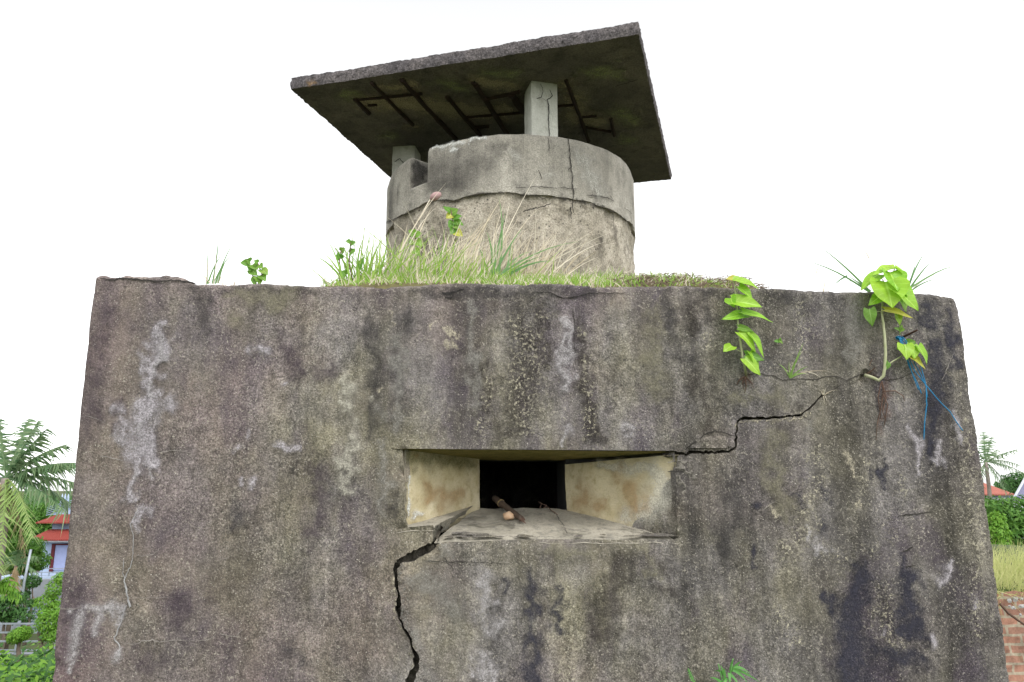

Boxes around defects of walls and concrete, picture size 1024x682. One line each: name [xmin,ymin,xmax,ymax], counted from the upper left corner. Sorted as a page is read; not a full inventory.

crack [516,87,632,228]
damp [110,320,175,527]
damp [443,284,607,442]
crack [663,372,915,458]
damp [68,603,123,673]
crack [392,526,501,682]
damp [819,557,937,682]